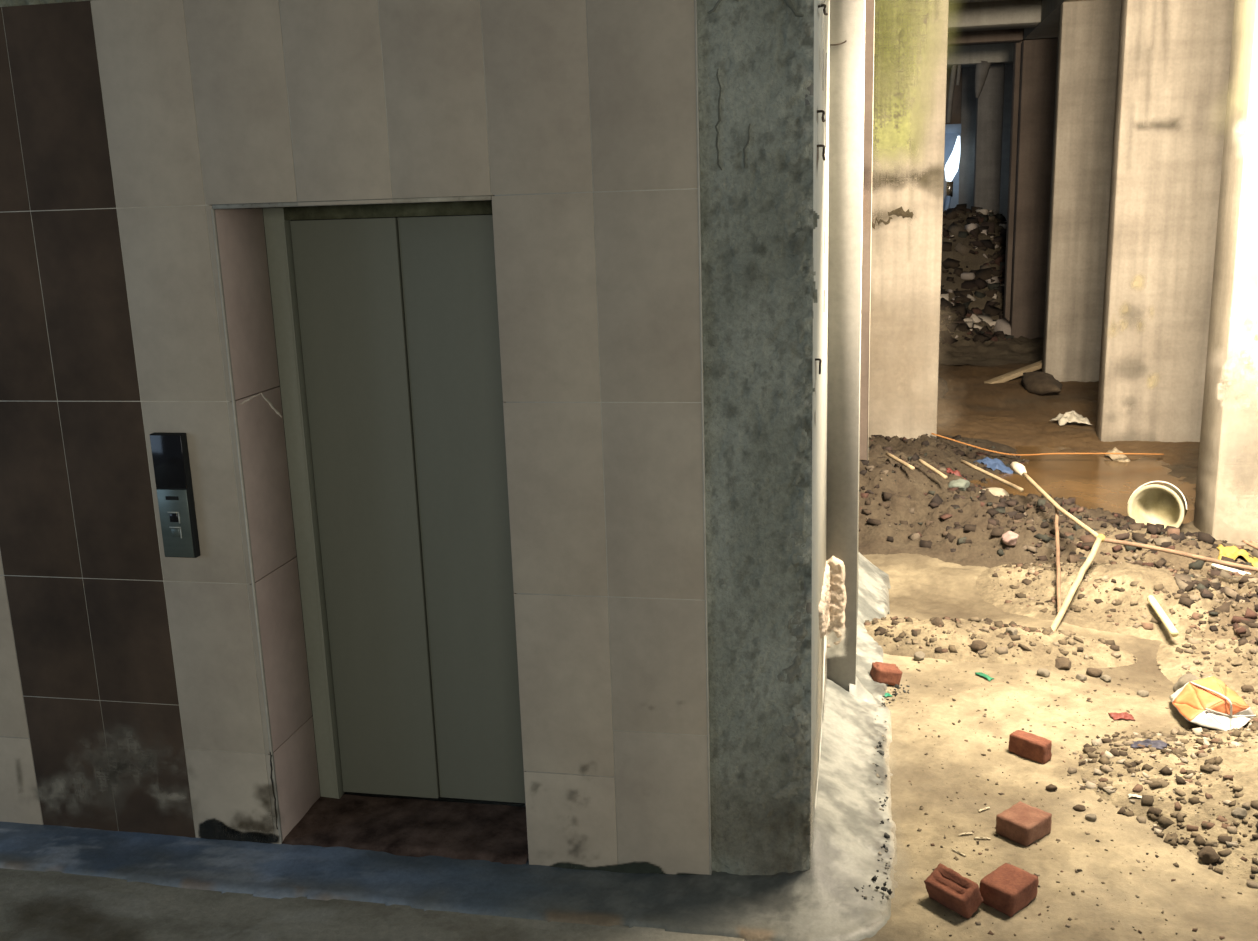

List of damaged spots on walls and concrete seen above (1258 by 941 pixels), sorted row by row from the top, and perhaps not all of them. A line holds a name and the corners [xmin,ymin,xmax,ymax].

water stain [872,170,941,187]
crack [872,206,914,229]
spalling [819,556,847,659]